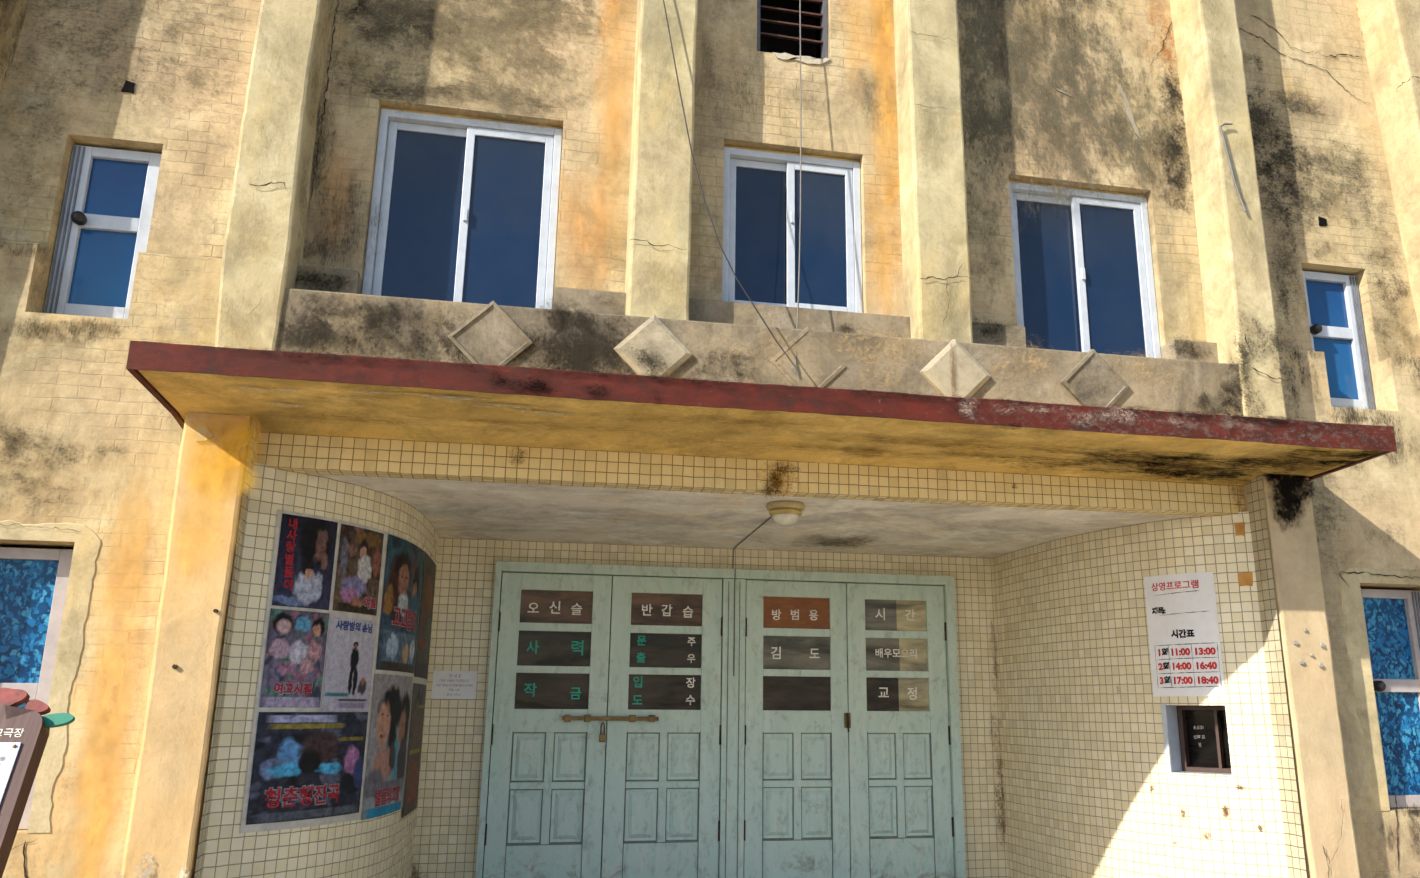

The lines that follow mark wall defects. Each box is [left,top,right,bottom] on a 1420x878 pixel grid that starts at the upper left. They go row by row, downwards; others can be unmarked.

water stain [328,0,577,116]
water stain [962,0,1191,207]
crack [1243,1,1419,103]
water stain [1248,87,1360,314]
water stain [5,272,117,342]
water stain [0,426,75,492]
water stain [762,463,798,495]
peeling [1075,407,1136,426]
water stain [1025,406,1400,542]
water stain [1172,319,1318,424]
crack [11,838,38,878]